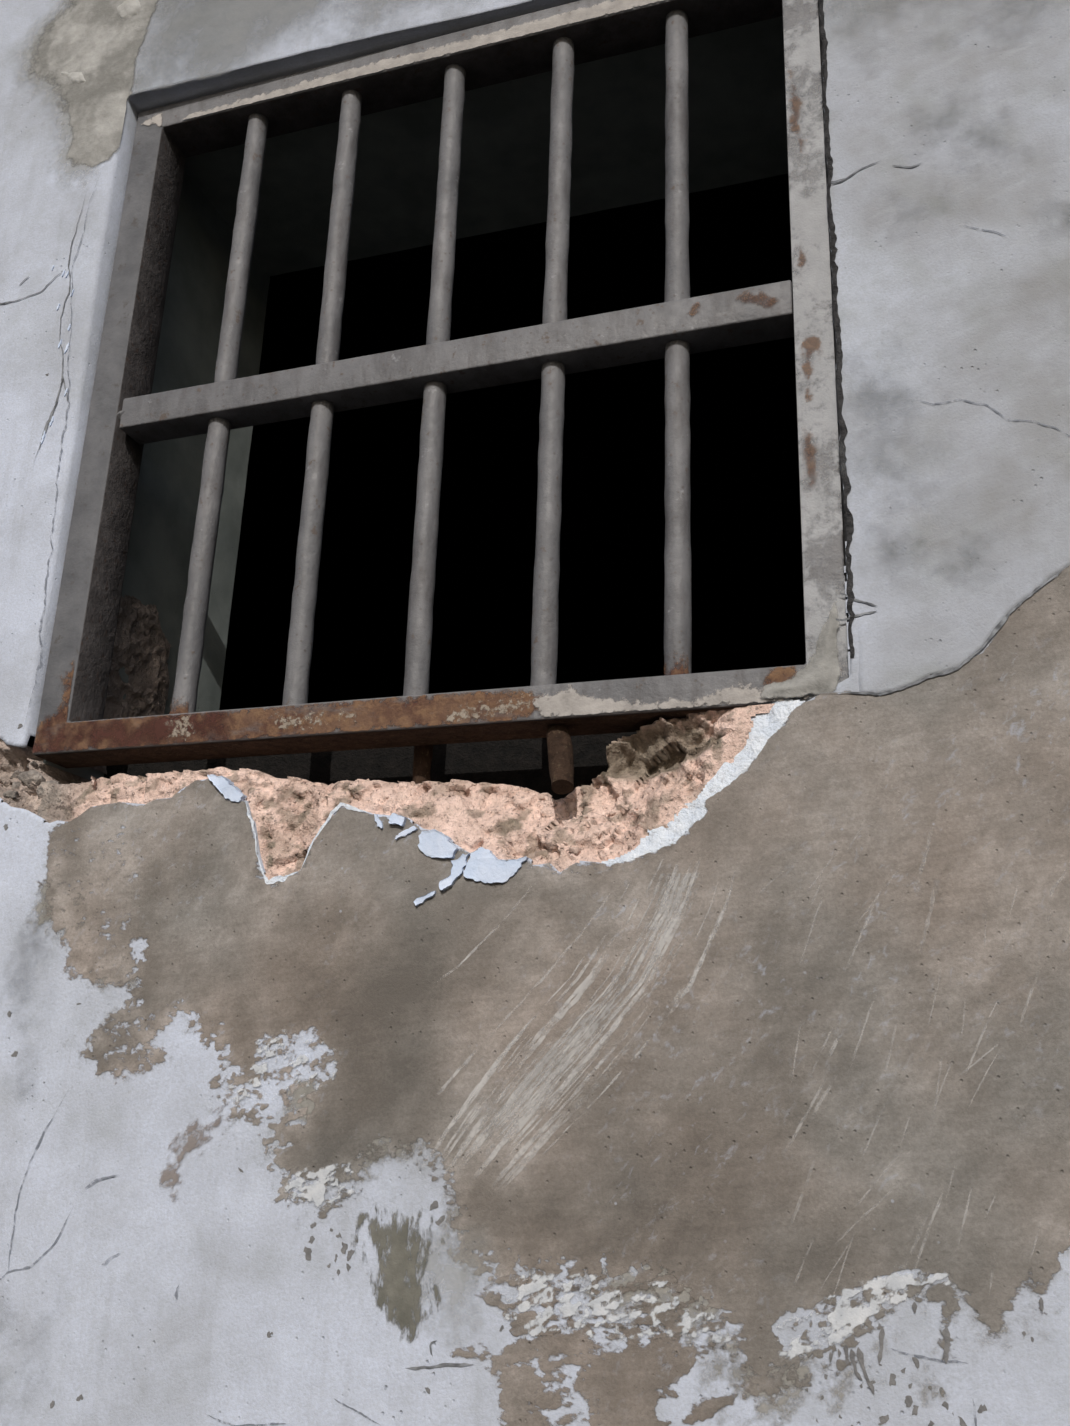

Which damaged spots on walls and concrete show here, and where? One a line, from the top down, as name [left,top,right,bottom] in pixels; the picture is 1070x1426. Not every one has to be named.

rust [790,96,803,145]
crack [0,187,88,465]
peeling [17,183,97,729]
rust [804,434,816,484]
rust [802,337,820,400]
rust [32,663,736,768]
peeling [0,565,1070,1418]
crack [6,1089,73,1274]